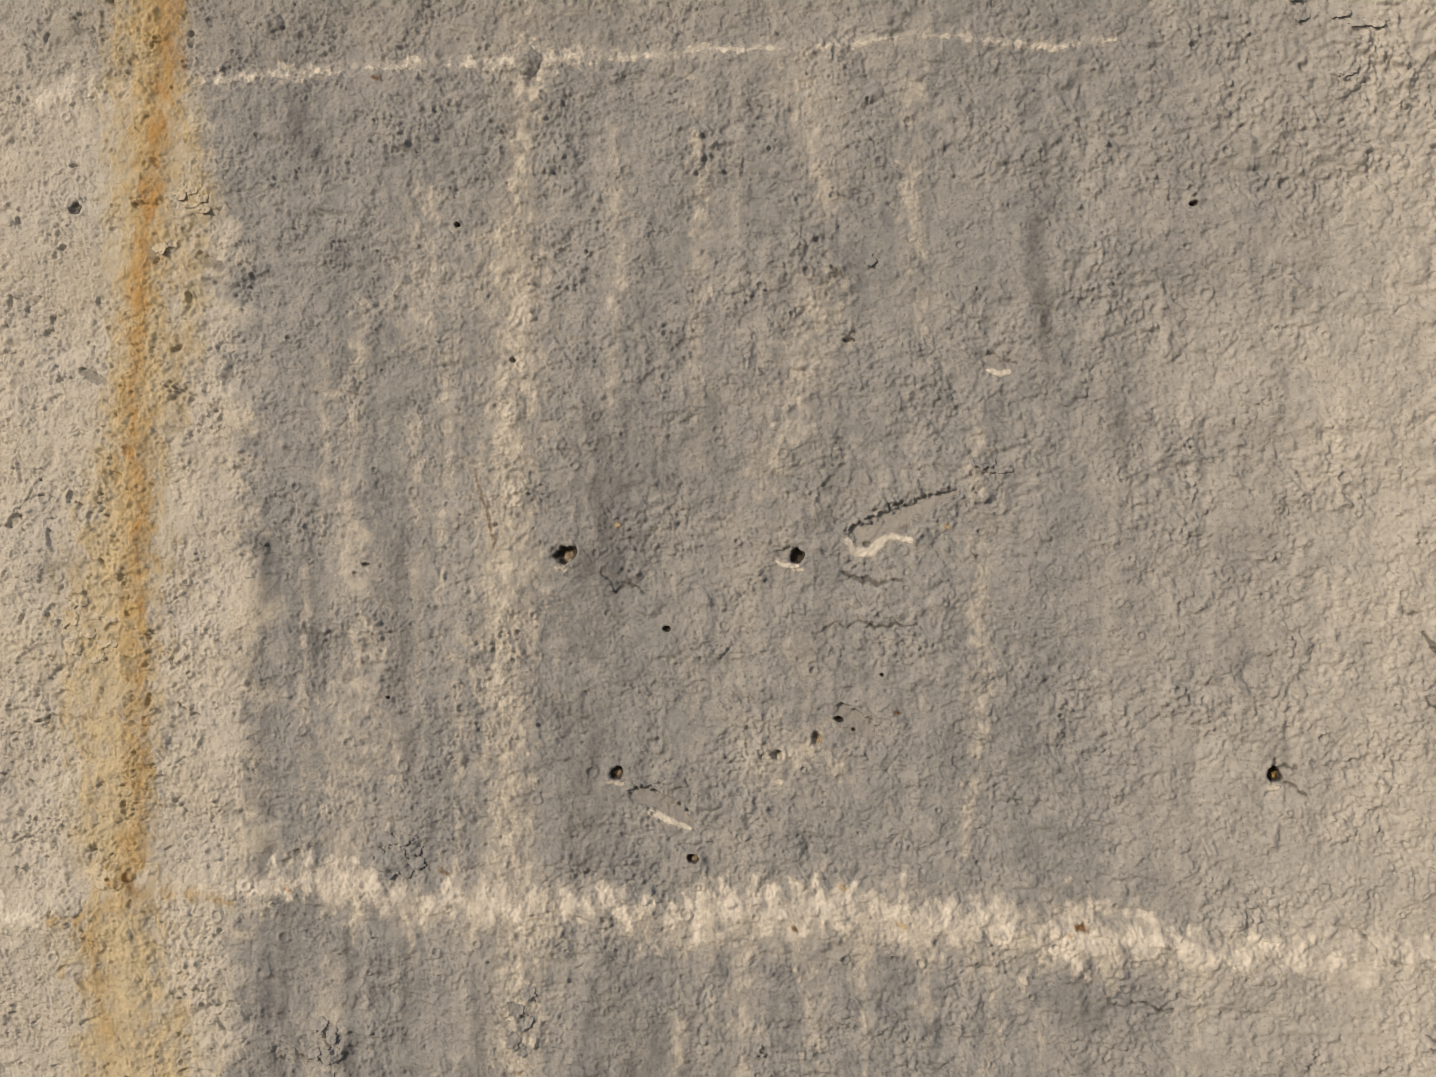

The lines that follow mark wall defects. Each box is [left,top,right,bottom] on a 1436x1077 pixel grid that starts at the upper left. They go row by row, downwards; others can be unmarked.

corrosion [61,0,198,1077]